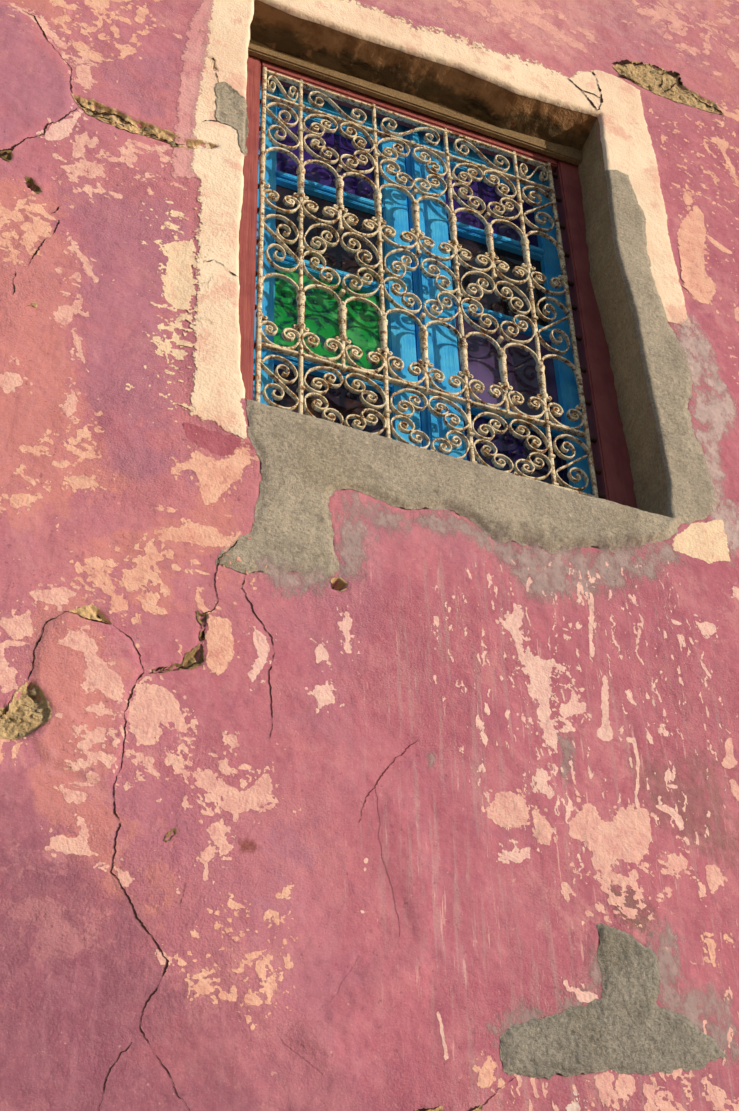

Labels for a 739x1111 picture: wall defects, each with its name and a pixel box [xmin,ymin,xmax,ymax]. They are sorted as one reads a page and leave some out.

crack [0,8,225,151]
peeling [0,176,115,372]
peeling [36,103,223,422]
peeling [613,0,739,390]
peeling [0,377,115,515]
peeling [0,433,301,1031]
crack [28,540,275,1111]
peeling [431,519,739,928]
crack [415,1078,514,1111]
peeling [561,977,598,1003]
peeling [468,1051,739,1111]
peeling [690,929,739,1066]